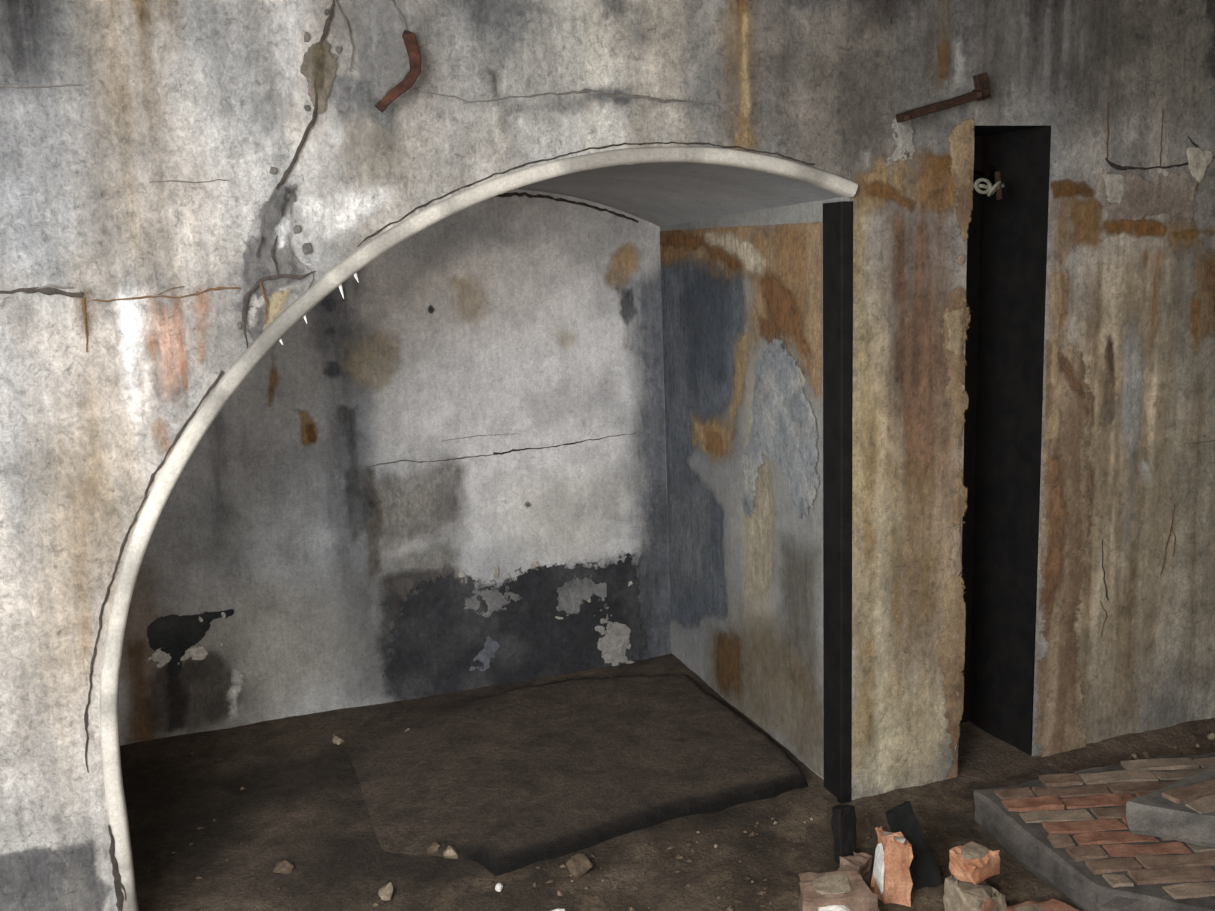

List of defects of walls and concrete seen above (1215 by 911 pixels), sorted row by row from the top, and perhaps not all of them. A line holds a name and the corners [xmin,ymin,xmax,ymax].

crack [423,88,718,106]
rust [736,0,751,146]
crack [0,0,354,352]
crack [357,142,815,247]
rust [859,156,956,211]
rust [1051,180,1215,350]
crack [364,433,634,467]
crack [84,370,225,772]
peeling [147,609,234,677]